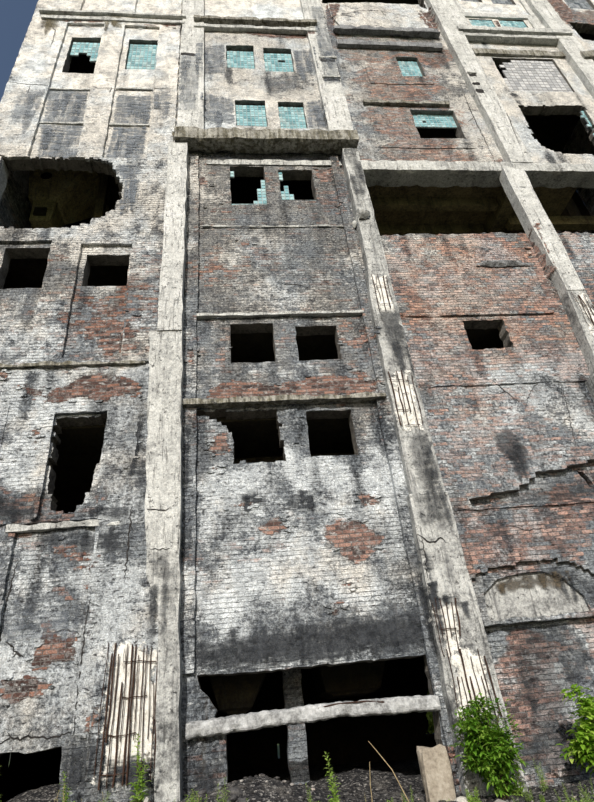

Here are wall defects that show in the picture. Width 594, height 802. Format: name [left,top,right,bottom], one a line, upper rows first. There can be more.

spalling [371,274,395,314]
peeling [77,308,144,355]
peeling [14,373,143,403]
peeling [206,368,425,431]
water stain [508,443,526,480]
crack [124,504,169,578]
peeling [324,512,385,564]
crack [0,562,23,657]
peeling [0,615,81,707]
spalling [428,598,502,733]